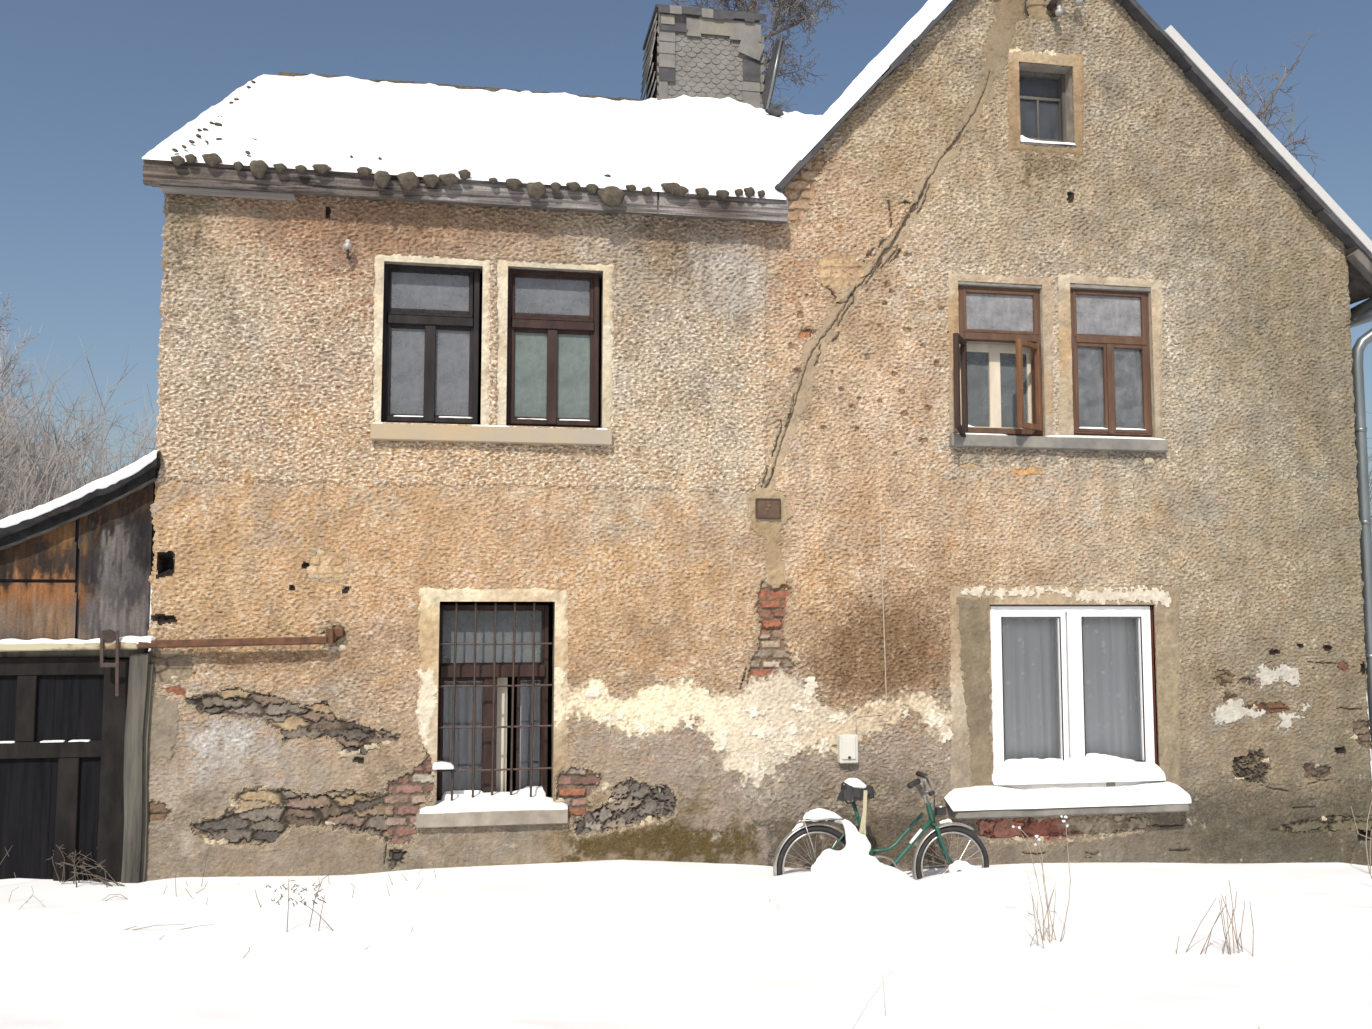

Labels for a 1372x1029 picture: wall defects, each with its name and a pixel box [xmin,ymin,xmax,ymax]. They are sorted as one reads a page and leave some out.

crack [756,5,1017,488]
peeling [960,585,1172,607]
damp [817,609,944,692]
spalling [148,649,438,871]
spalling [553,764,678,837]
peeling [554,575,954,824]
spalling [975,813,1152,861]
spalling [1209,656,1315,784]
spalling [1297,762,1331,785]
spalling [1344,719,1372,749]